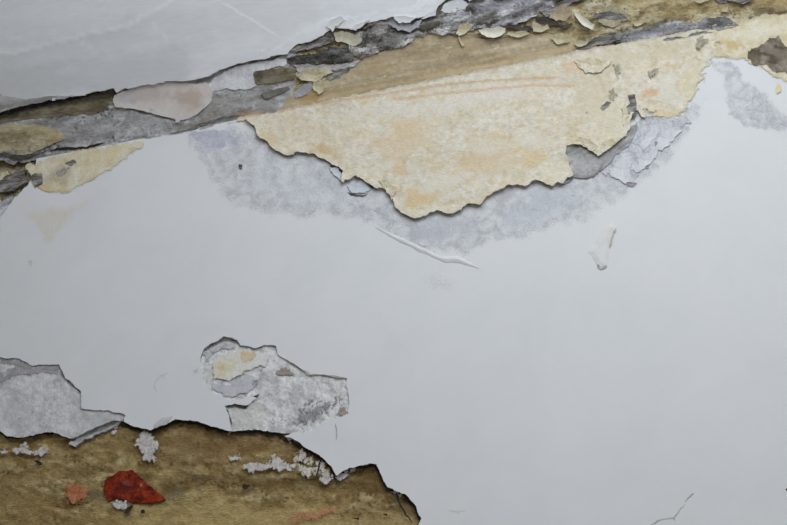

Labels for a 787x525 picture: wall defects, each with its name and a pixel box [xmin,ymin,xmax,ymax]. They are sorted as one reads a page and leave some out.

peeling [0,0,787,219]
damp [186,97,707,257]
flaking render [0,336,421,525]